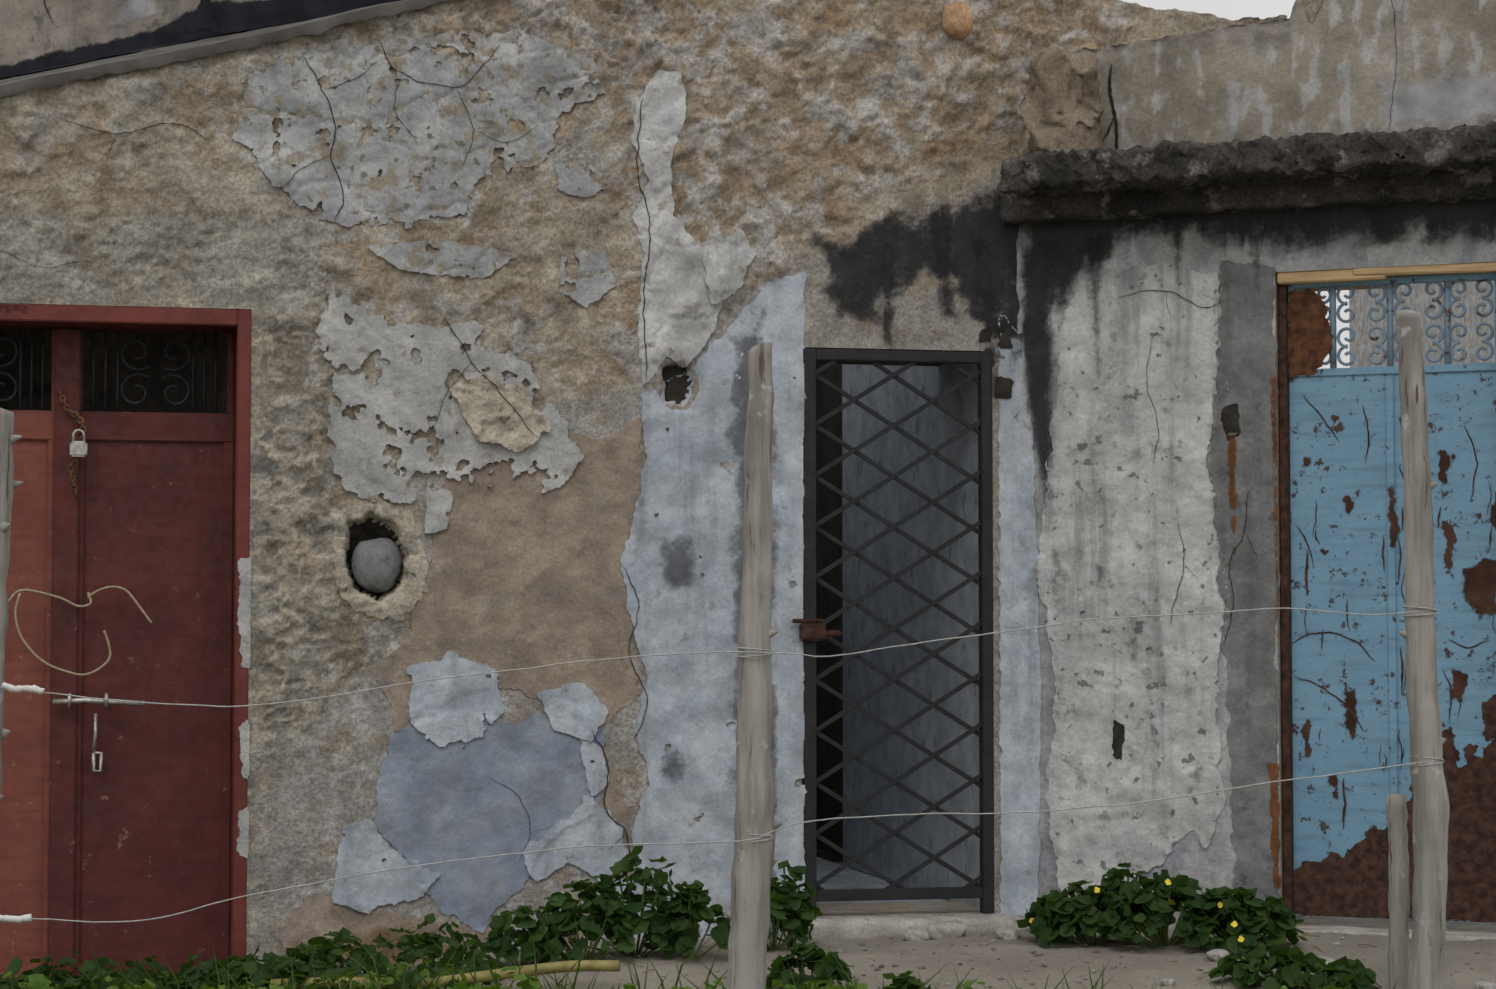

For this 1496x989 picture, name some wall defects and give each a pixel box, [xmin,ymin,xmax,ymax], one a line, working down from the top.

flaking render [232,29,609,279]
crack [1103,64,1118,150]
damp [814,190,1496,496]
flaking render [270,70,807,967]
rust [1271,288,1333,611]
rust [1382,466,1406,603]
rust [1434,450,1496,633]
rust [1300,719,1321,757]
rust [1267,763,1390,919]
rust [1345,689,1358,739]
rust [1379,729,1414,920]
rust [1442,669,1496,923]